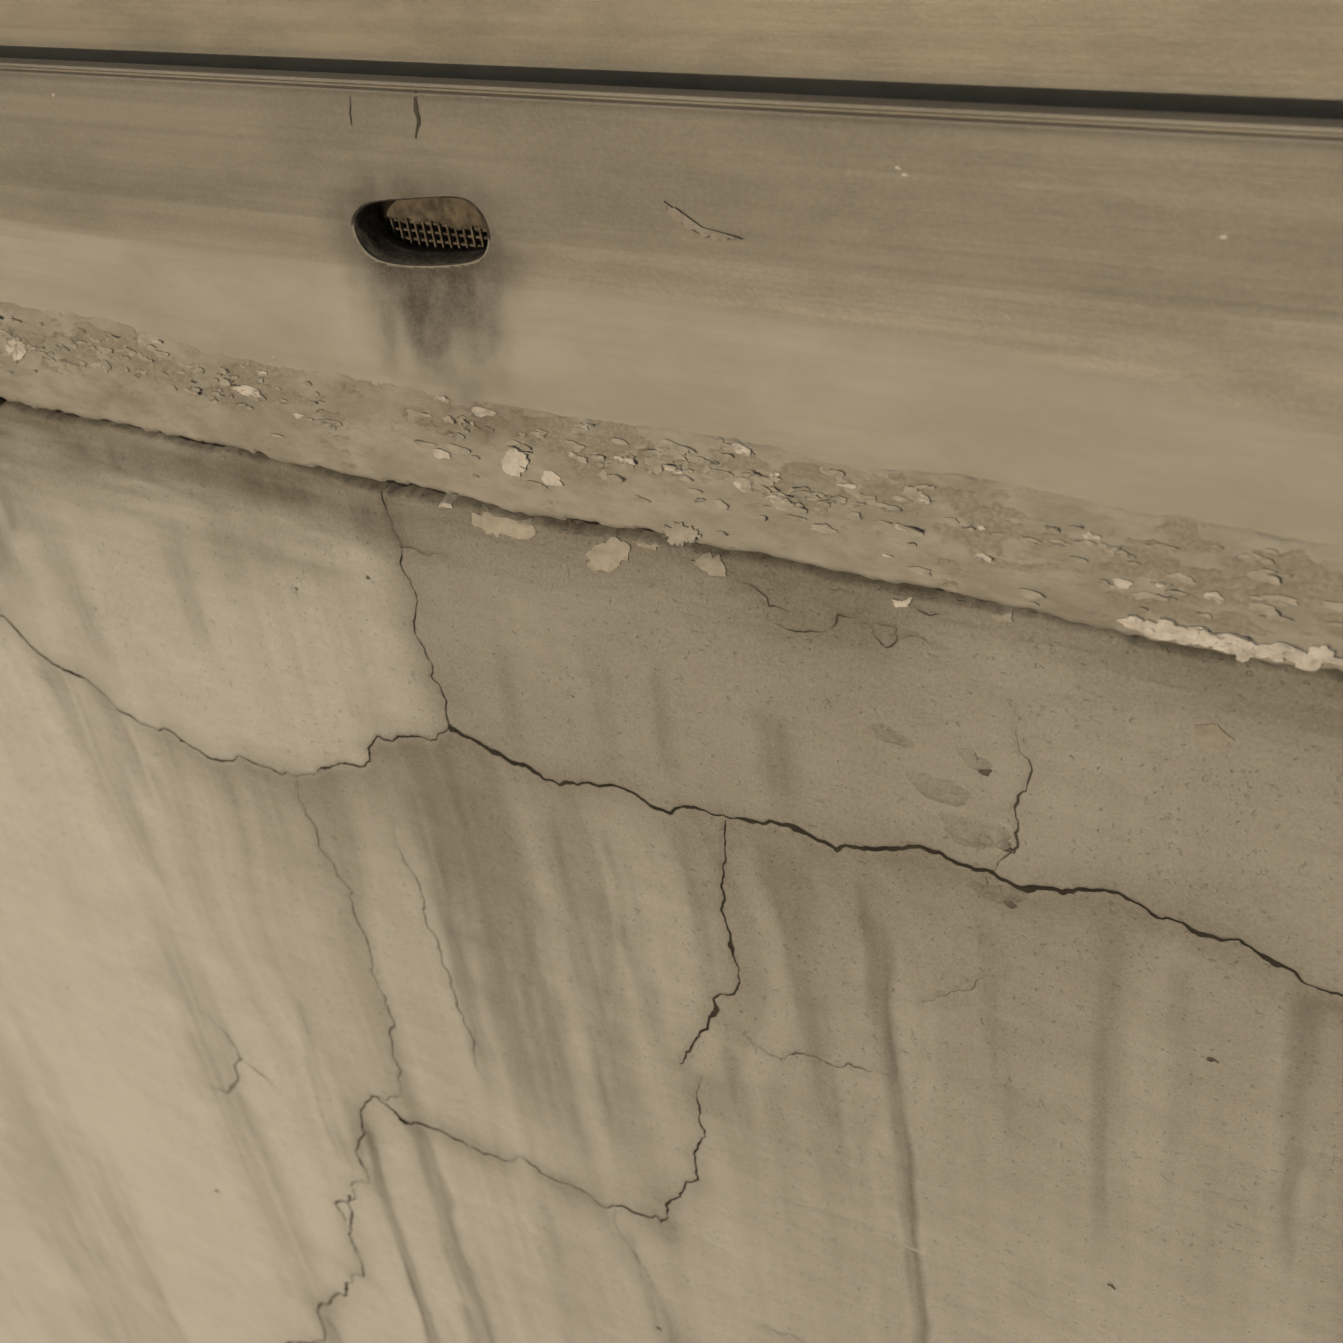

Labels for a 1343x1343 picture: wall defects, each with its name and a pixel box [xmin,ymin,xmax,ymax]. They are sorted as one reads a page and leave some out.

crack [54,409,227,447]
peeling [0,315,342,431]
peeling [412,396,564,492]
peeling [564,422,936,547]
peeling [891,596,913,608]
peeling [991,588,1046,623]
peeling [1021,525,1343,671]
crack [0,477,1343,1343]